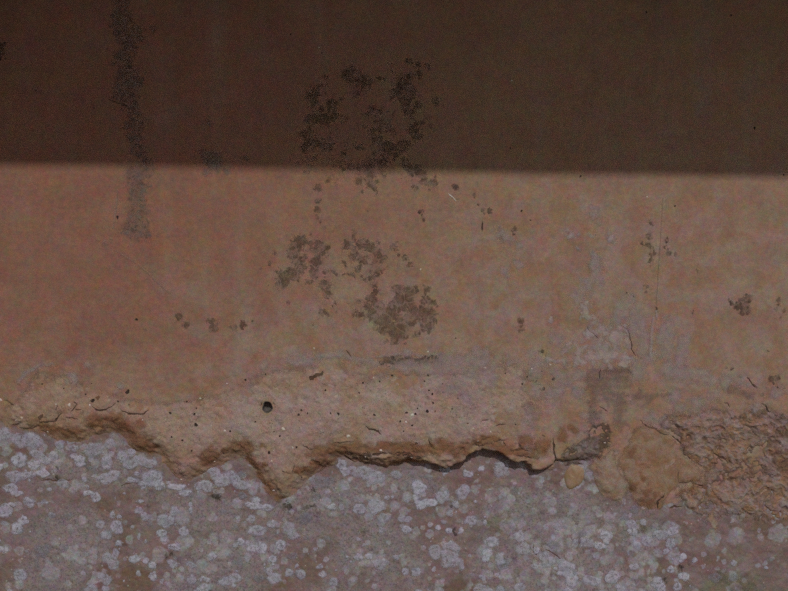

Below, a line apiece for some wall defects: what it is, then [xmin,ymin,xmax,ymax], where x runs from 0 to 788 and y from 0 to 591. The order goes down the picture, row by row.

spalling [562,423,611,465]
spalling [662,409,788,523]